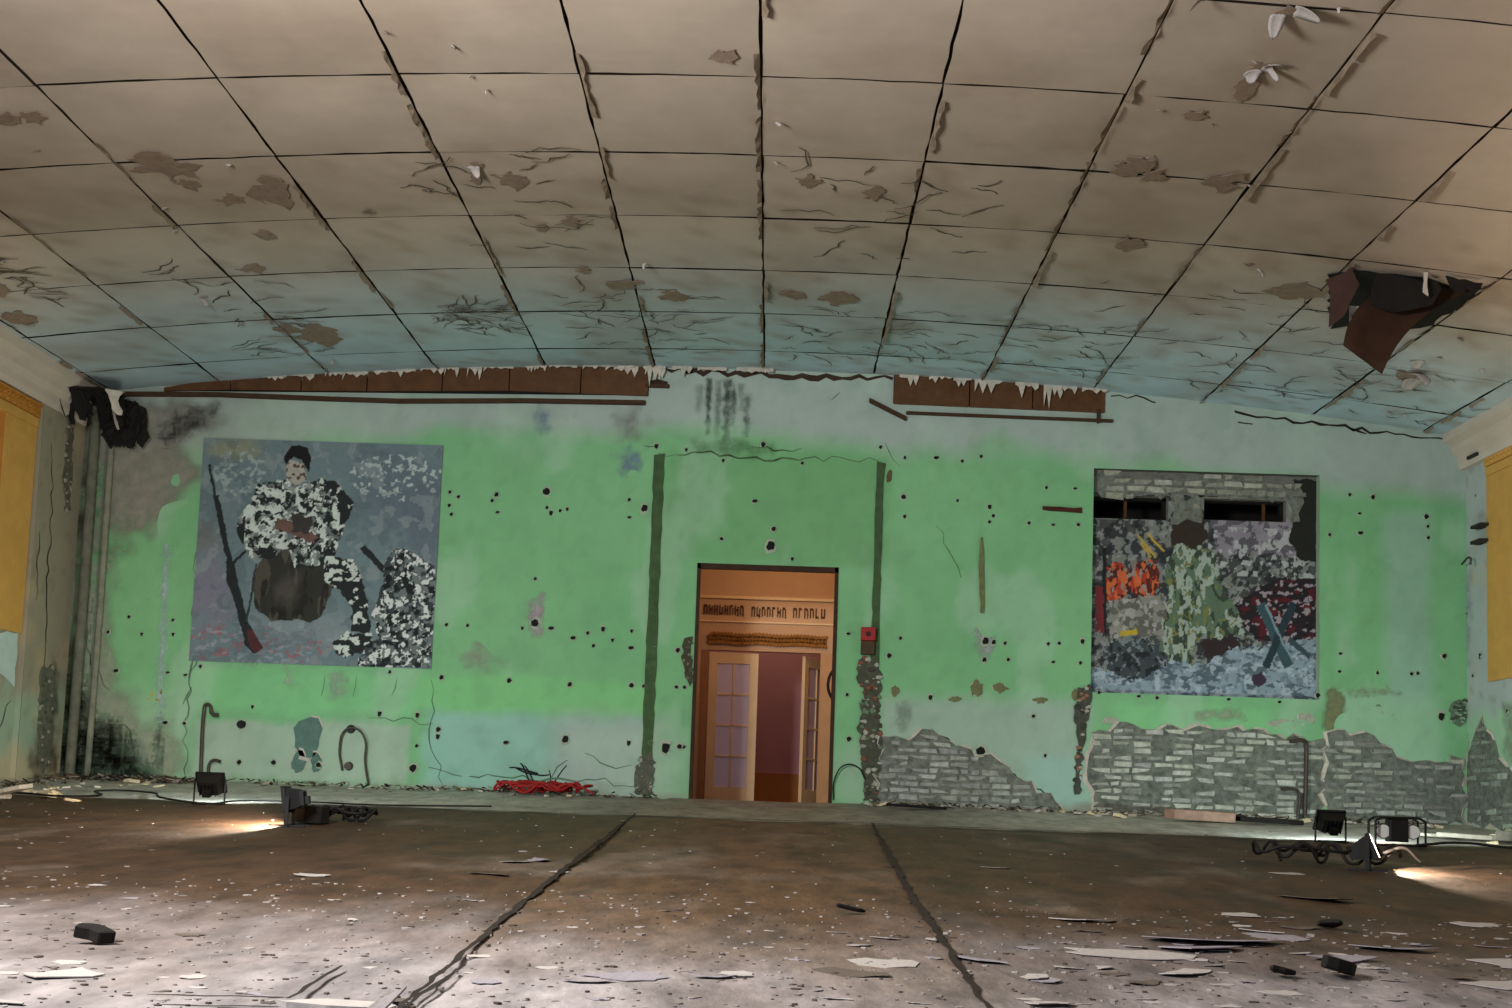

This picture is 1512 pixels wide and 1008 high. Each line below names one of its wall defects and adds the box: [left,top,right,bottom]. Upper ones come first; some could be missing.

peeling [1233,61,1286,103]
peeling [1268,4,1322,40]
crack [401,147,1488,440]
leakage [35,402,219,779]
flaking render [845,636,1512,831]
crack [324,679,1340,1008]
crack [147,965,343,1008]